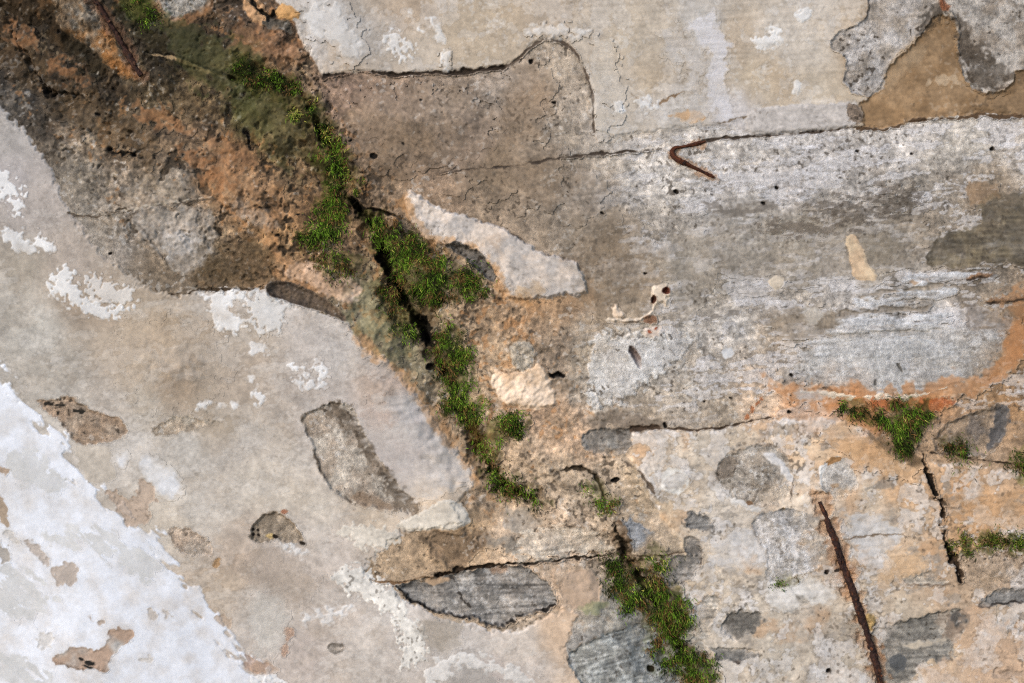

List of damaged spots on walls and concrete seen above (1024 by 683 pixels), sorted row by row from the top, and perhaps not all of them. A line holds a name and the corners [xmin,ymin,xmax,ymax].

crack [321,37,669,175]
rust [666,109,720,184]
peeling [829,0,1024,132]
damp [119,172,220,276]
damp [280,260,364,308]
peeling [346,189,576,395]
peeling [0,359,288,683]
spalling [394,565,562,629]
crack [368,503,643,587]
crack [550,464,598,478]
rust [806,485,931,683]
crack [845,451,1013,585]